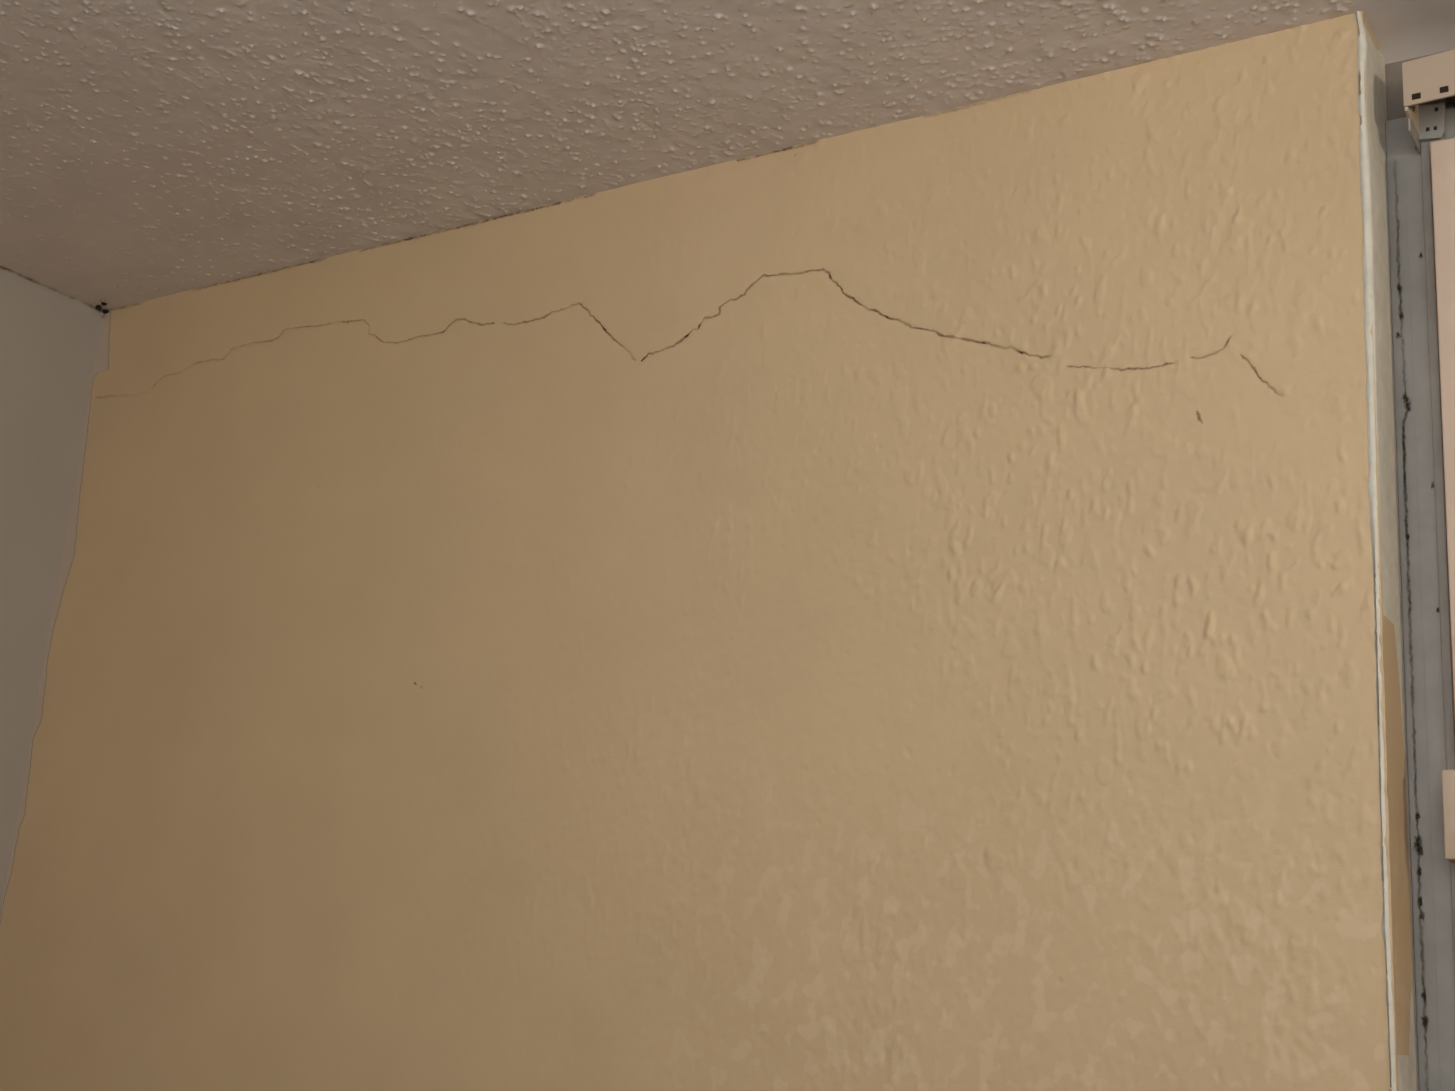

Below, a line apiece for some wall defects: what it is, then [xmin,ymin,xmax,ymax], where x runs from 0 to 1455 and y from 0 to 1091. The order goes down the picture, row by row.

crack [807,269,985,343]